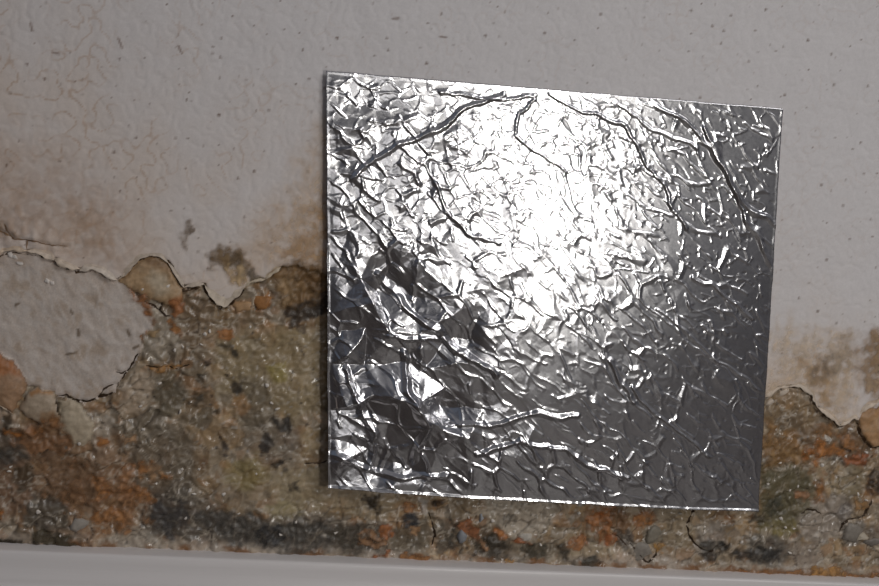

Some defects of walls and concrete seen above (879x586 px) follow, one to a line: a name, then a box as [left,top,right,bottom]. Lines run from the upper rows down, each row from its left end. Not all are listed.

crack [0,224,110,280]
leakage [211,247,328,333]
leakage [771,330,879,413]
leakage [259,417,290,453]
spalling [0,246,879,578]
leakage [0,529,76,546]
leakage [150,501,381,556]
leakage [475,534,510,560]
leakage [582,556,602,566]
leakage [700,540,780,562]